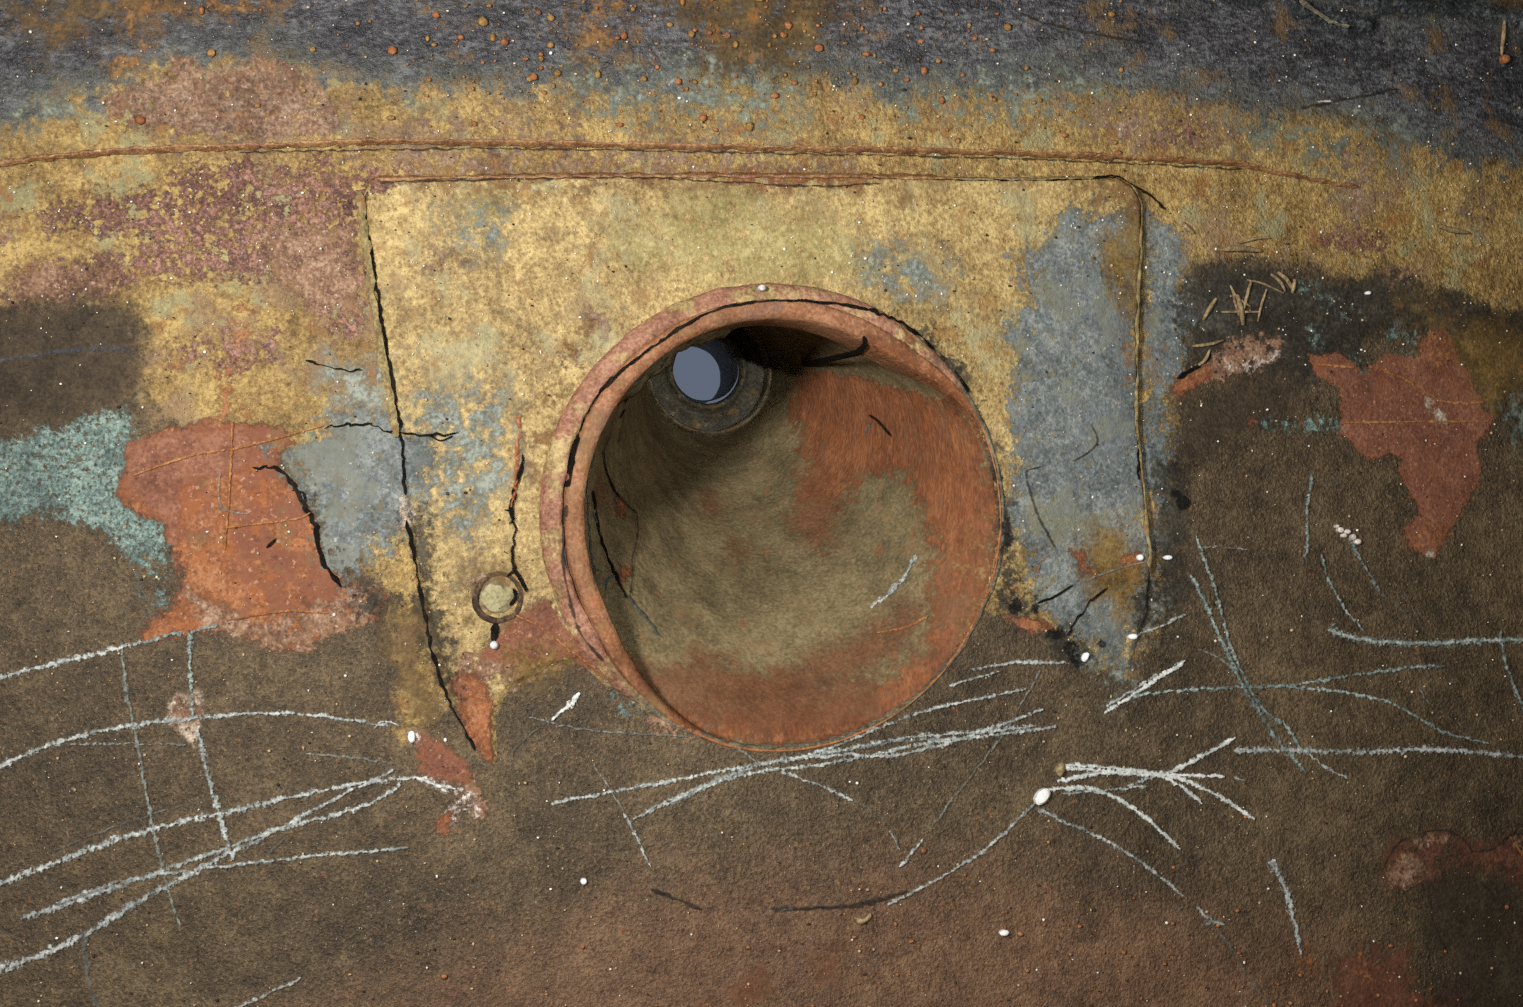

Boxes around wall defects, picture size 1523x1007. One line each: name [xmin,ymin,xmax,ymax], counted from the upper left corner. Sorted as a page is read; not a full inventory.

crack [305,360,362,372]
crack [325,422,458,441]
corrosion [0,0,1002,837]
crack [252,465,341,587]
peeling [128,547,174,618]